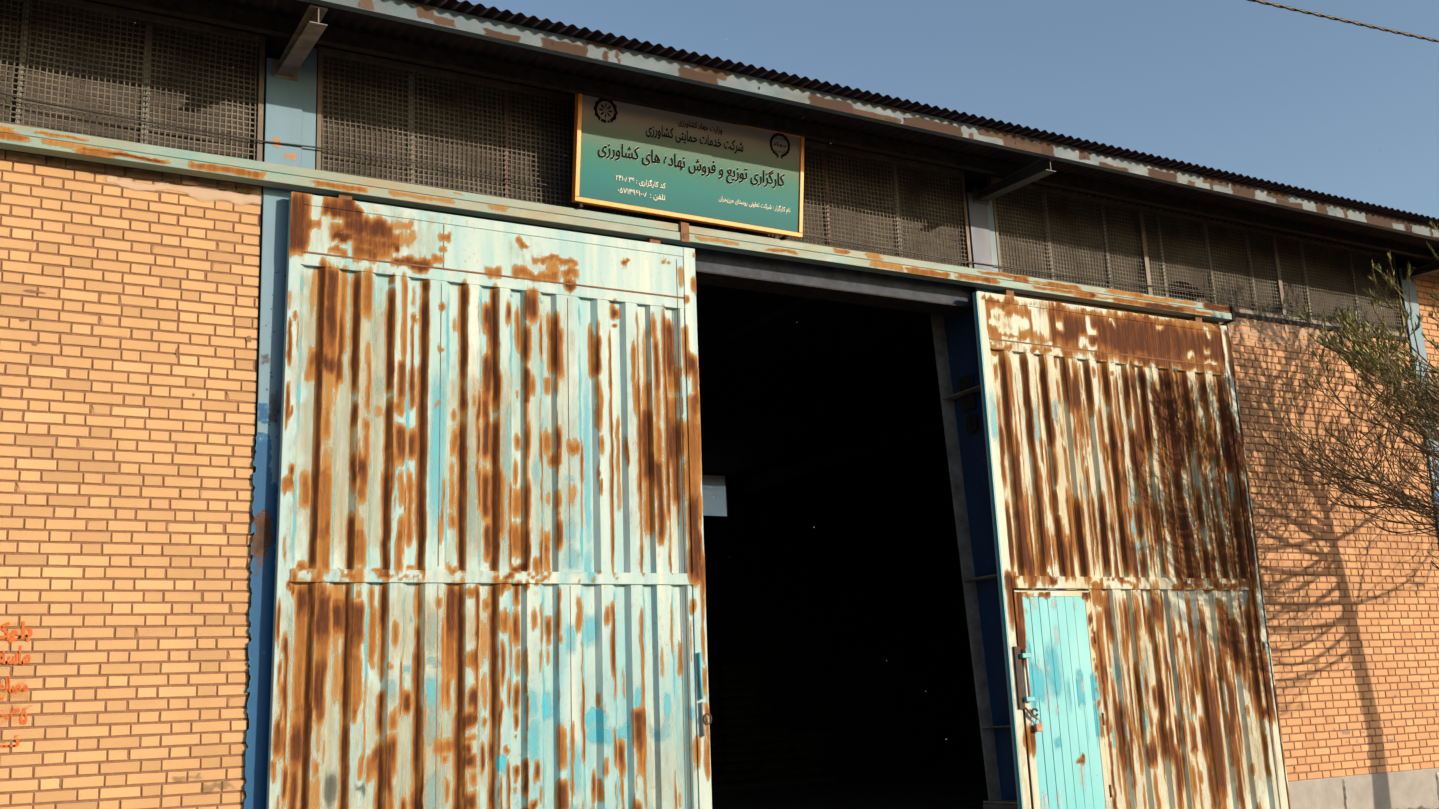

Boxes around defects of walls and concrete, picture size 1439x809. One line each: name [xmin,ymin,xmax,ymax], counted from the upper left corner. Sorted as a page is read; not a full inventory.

corrosion [0,126,170,164]
corrosion [188,160,266,179]
corrosion [662,236,739,304]
corrosion [252,180,710,809]
corrosion [834,248,1291,809]